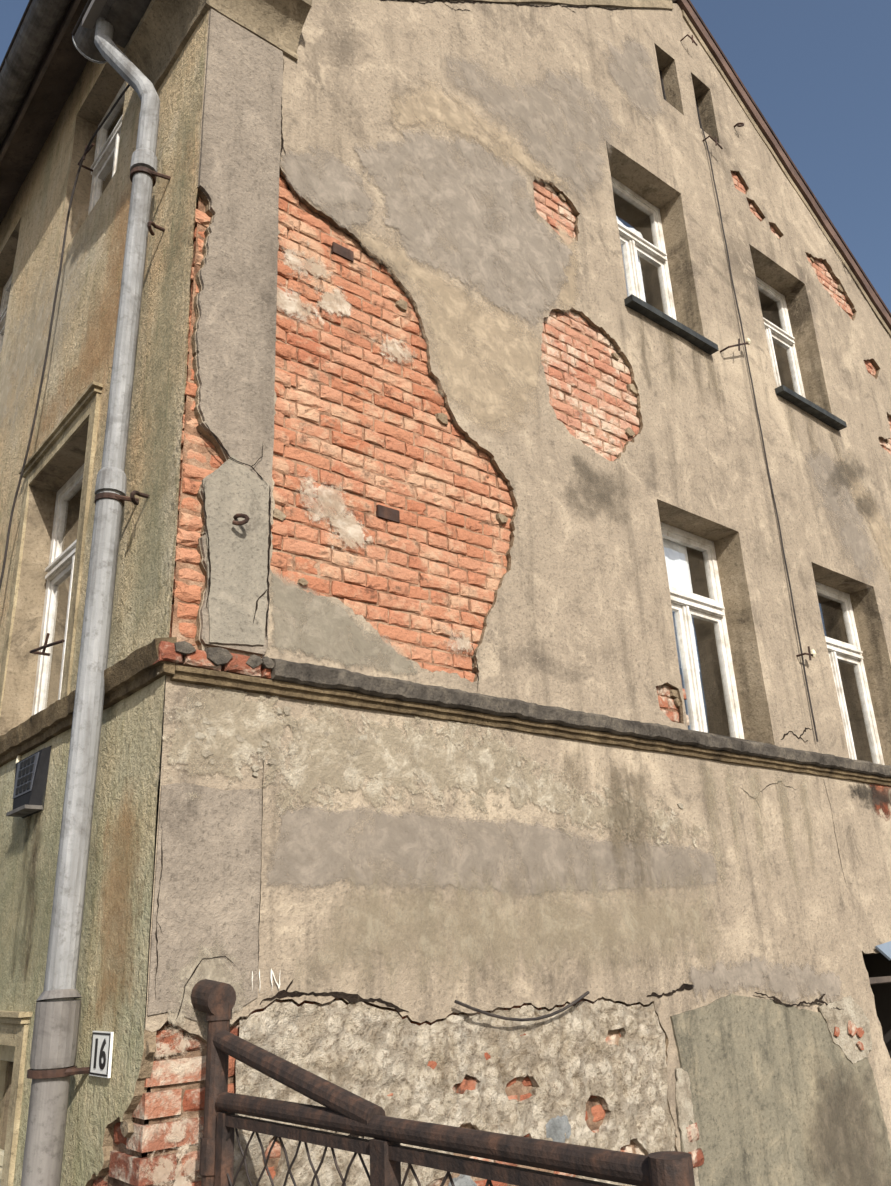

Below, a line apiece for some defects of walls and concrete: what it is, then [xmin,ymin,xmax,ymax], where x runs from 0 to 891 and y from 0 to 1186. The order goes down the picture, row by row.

flaking render [730,170,784,240]
flaking render [805,252,857,321]
flaking render [270,85,643,682]
flaking render [864,358,880,380]
flaking render [152,187,271,679]
flaking render [656,675,690,726]
peeling [156,687,707,847]
corrosion [870,784,891,820]
crack [155,756,264,1019]
crack [260,980,409,1012]
crack [755,973,844,1010]
flaking render [85,993,207,1186]